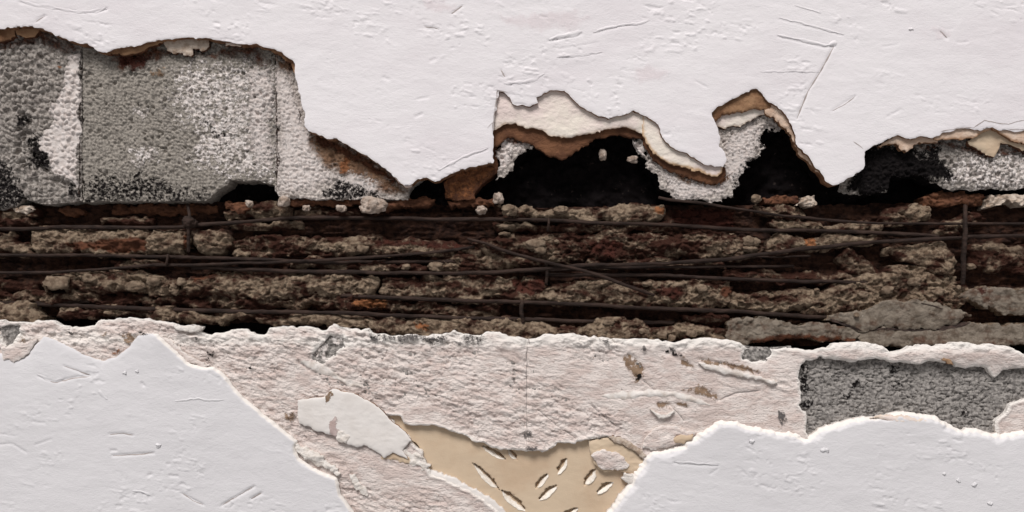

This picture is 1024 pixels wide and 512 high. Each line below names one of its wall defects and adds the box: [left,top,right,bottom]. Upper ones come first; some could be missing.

peeling [0,28,42,44]
peeling [106,39,211,58]
peeling [271,50,295,74]
peeling [493,91,726,185]
peeling [712,90,820,174]
peeling [876,128,1024,158]
spalling [0,200,1024,367]
peeling [699,363,777,384]
peeling [297,388,525,512]
peeling [585,408,696,494]